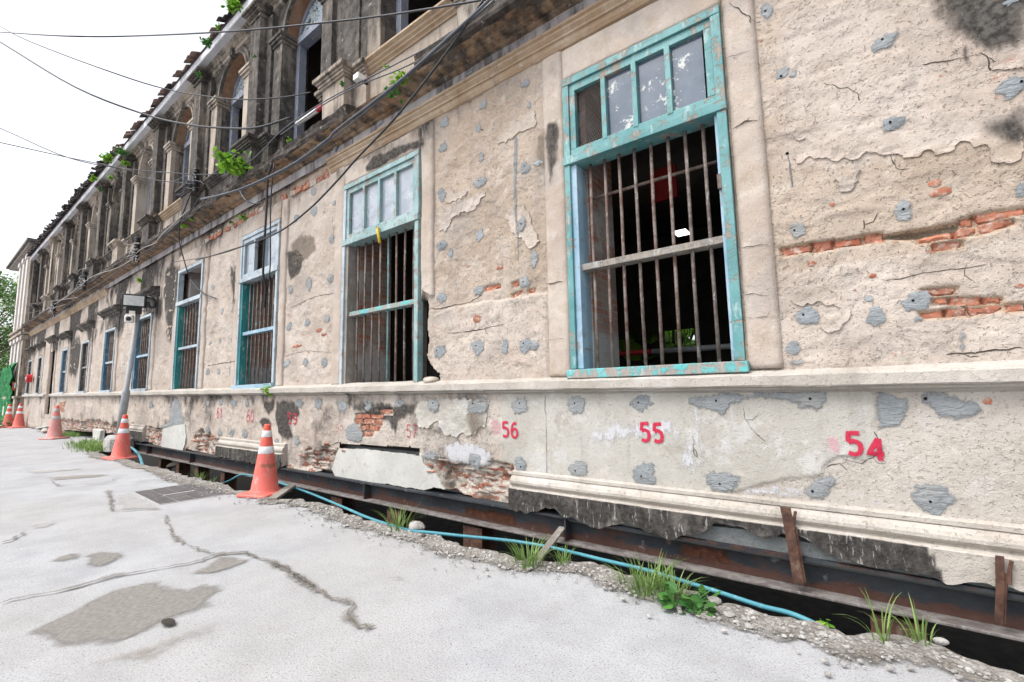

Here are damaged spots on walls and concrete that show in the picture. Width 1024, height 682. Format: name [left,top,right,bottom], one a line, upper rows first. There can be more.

mould [937,0,1024,60]
crack [922,52,996,71]
leakage [538,123,558,173]
leakage [287,236,315,279]
flaking render [781,209,1024,266]
flaking render [920,288,1024,319]
spalling [423,358,440,383]
crack [946,347,1024,357]
leakage [260,400,299,439]
peeling [416,397,489,437]
rust [466,508,515,524]
crack [1,478,375,629]